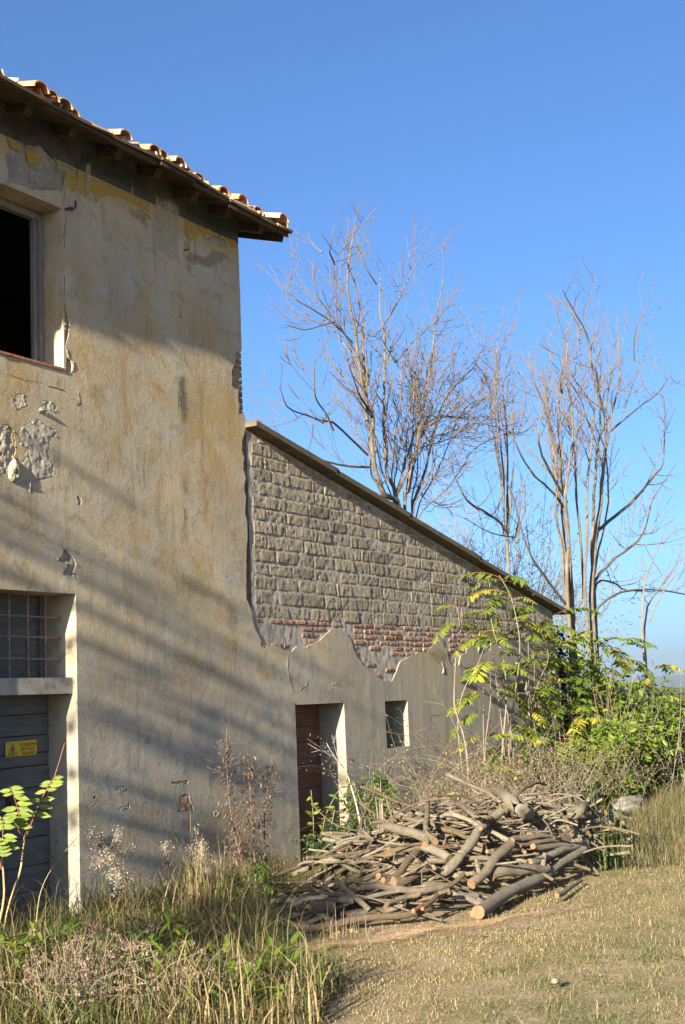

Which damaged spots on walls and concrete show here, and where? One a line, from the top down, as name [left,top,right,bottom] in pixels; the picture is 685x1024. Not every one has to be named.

flaking render [5,140,149,212]
peeling [184,220,237,265]
flaking render [0,393,57,494]
flaking render [57,549,77,577]
flaking render [171,780,193,812]